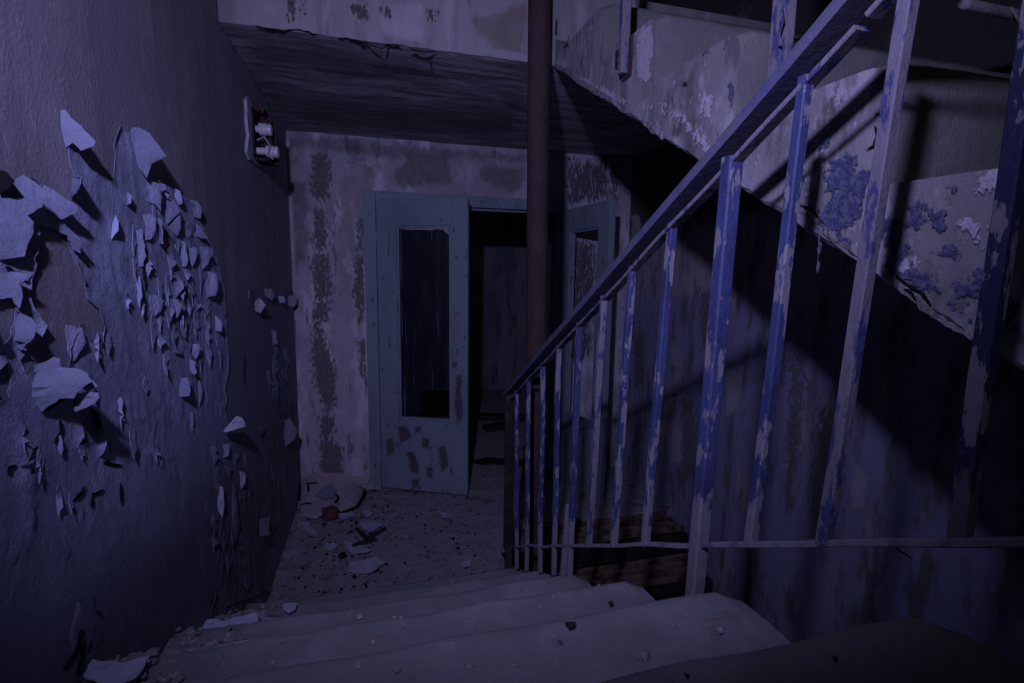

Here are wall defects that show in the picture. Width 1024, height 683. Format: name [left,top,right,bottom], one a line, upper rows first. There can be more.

spalling [643,120,667,140]
peeling [0,109,281,683]
peeling [249,288,298,445]
leakage [292,152,345,474]
leakage [352,219,365,323]
peeling [799,134,871,274]
peeling [880,198,984,340]